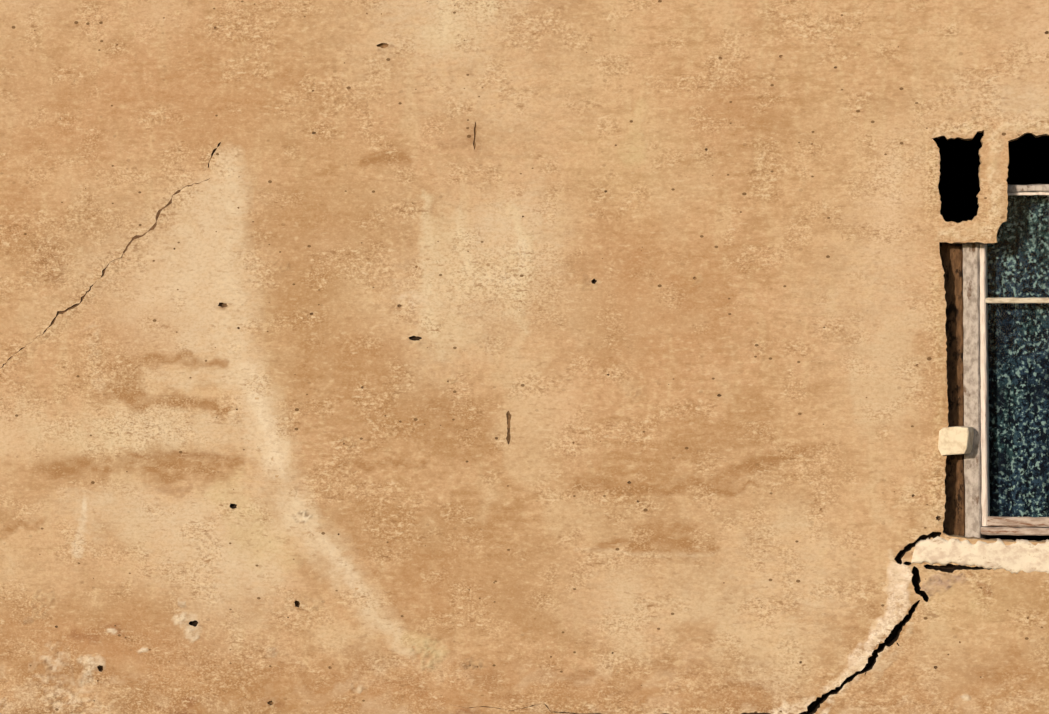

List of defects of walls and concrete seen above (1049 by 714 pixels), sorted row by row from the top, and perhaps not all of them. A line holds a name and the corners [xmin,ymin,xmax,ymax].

crack [0,135,227,373]
flaking render [925,116,1049,242]
crack [454,532,992,714]